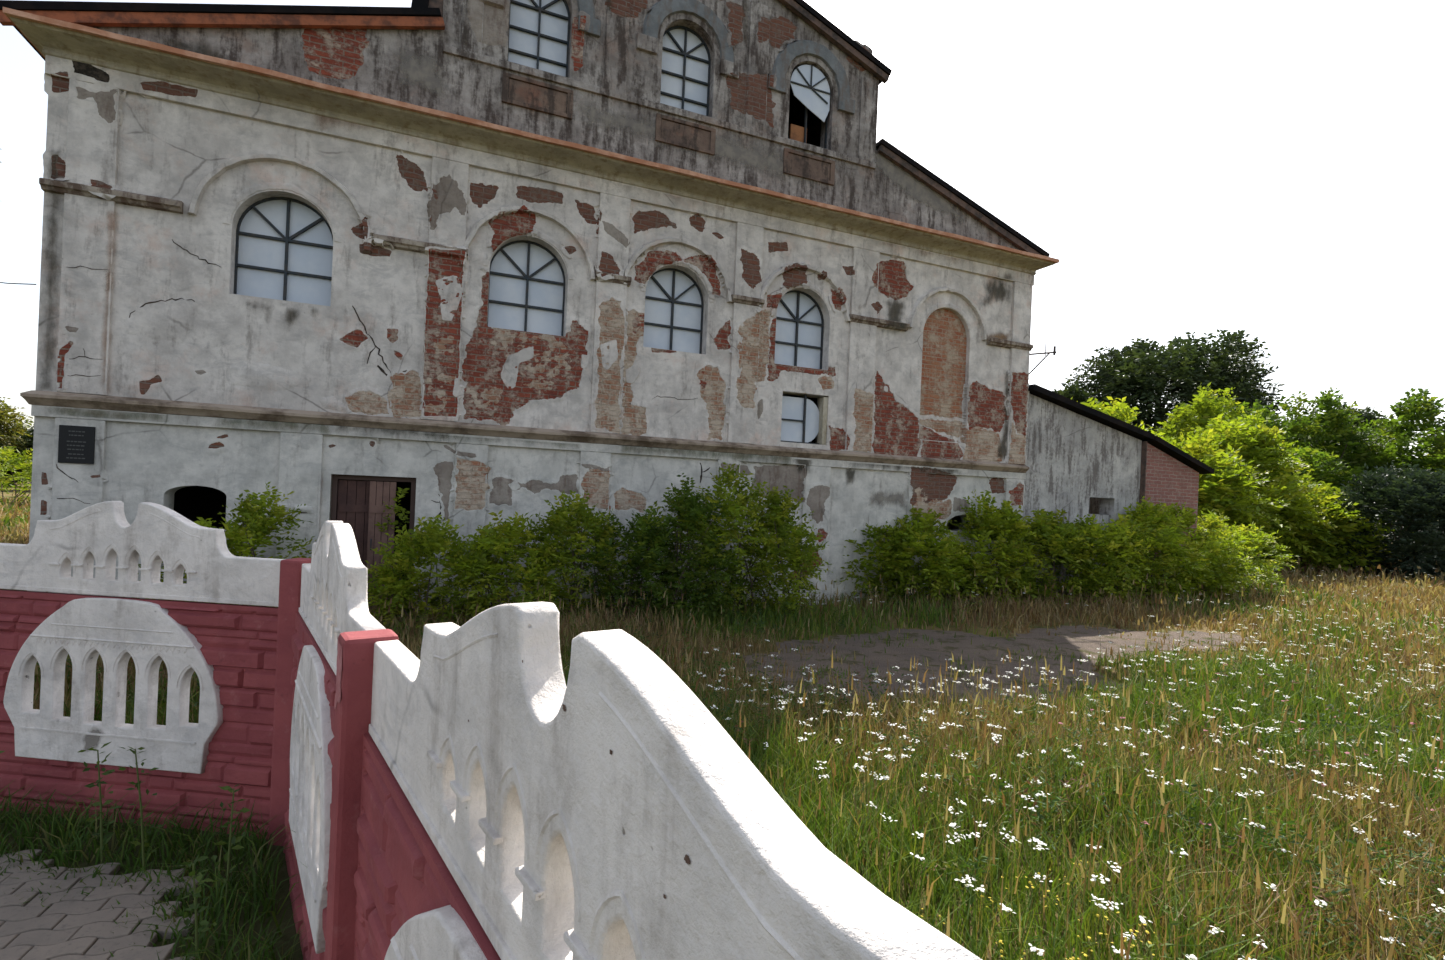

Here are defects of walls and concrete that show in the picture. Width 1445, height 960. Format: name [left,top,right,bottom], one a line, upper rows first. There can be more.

spalling [295,28,375,85]
spalling [570,0,652,76]
spalling [723,0,801,131]
crack [352,306,407,376]
spalling [335,150,1029,523]
spalling [716,459,832,583]